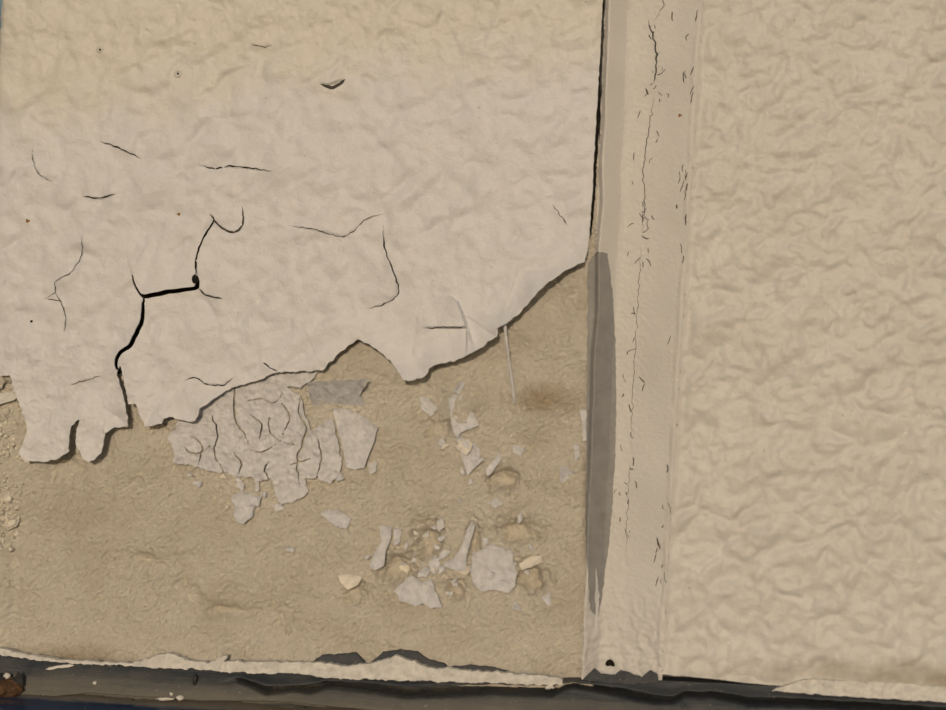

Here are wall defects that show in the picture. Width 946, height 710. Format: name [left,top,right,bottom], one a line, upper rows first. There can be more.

crack [200,164,267,172]
crack [43,242,83,331]
crack [72,208,244,385]
crack [293,214,399,308]
peeling [0,98,658,688]